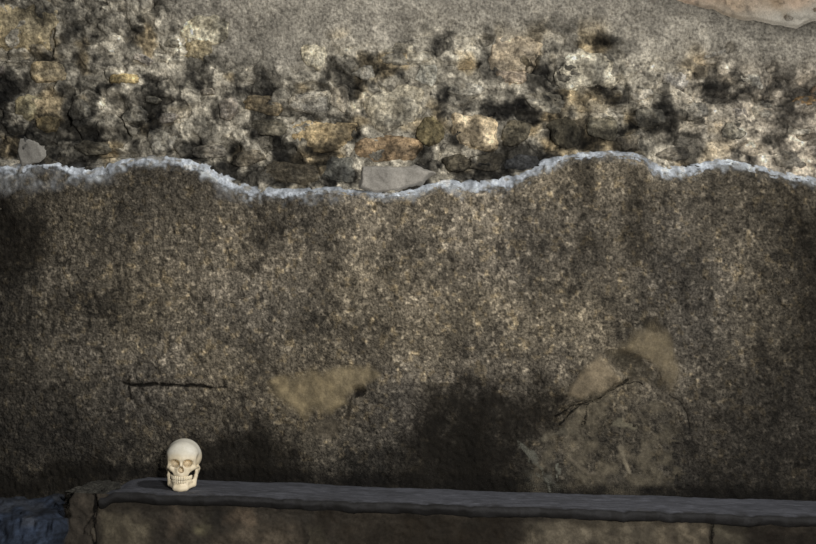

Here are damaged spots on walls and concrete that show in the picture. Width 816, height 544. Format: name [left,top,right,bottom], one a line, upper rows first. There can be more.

spalling [0,0,816,198]
crack [123,376,227,399]
spalling [272,369,377,411]
crack [555,378,643,427]